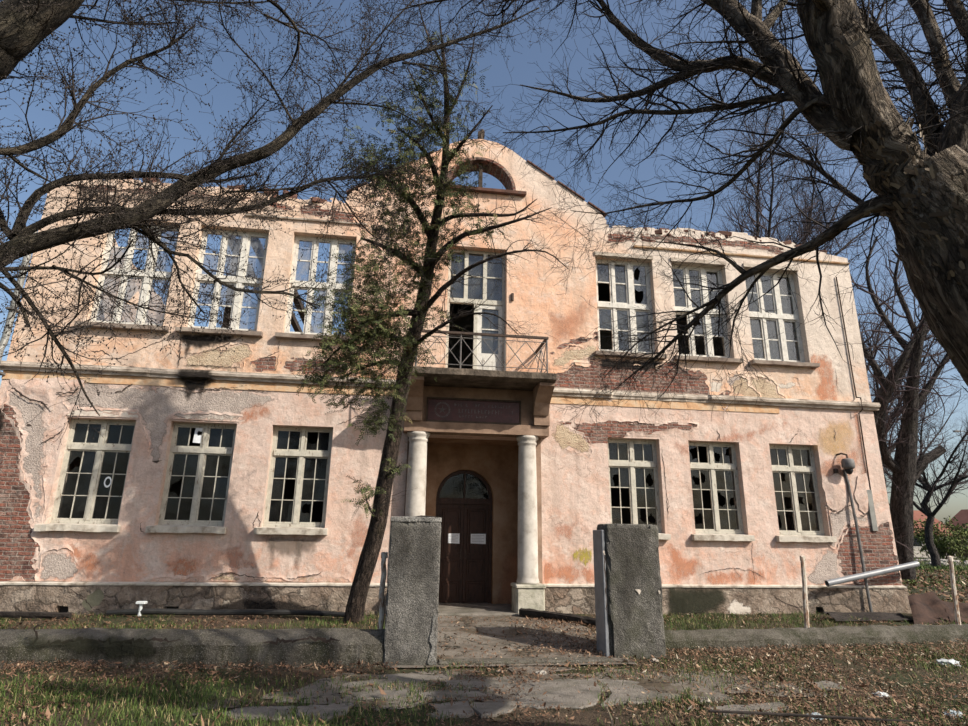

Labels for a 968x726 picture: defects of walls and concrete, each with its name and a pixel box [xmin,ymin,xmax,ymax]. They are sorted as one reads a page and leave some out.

flaking render [598,224,796,259]
water stain [177,369,213,397]
water stain [181,334,232,354]
flaking render [175,336,354,377]
flaking render [540,324,805,461]
flaking render [811,356,836,400]
flaking render [0,381,285,615]
flaking render [800,501,902,585]